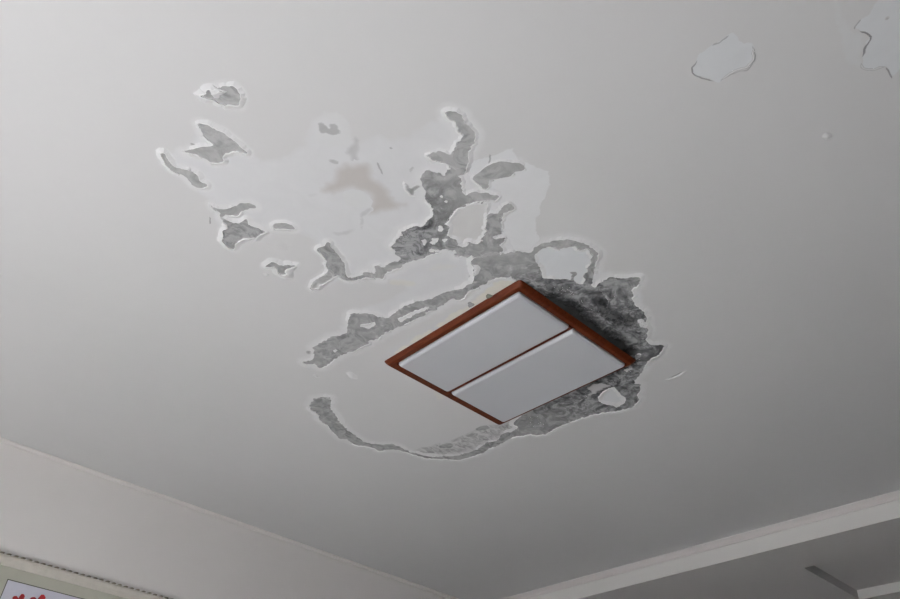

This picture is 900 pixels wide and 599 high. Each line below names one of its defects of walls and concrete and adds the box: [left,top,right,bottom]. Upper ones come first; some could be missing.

peeling [830,0,900,79]
peeling [150,74,306,256]
water stain [307,109,411,237]
peeling [255,97,676,464]
water stain [534,289,636,365]